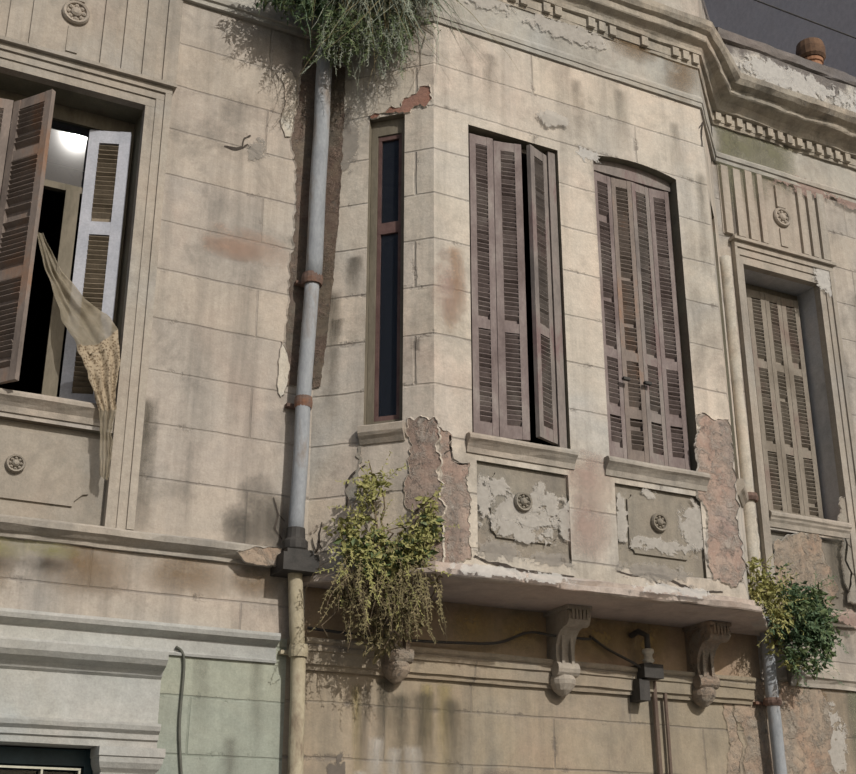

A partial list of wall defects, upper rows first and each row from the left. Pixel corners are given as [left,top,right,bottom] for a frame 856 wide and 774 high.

peeling [279,70,298,138]
flaking render [369,84,433,120]
peeling [736,55,856,112]
peeling [341,106,359,172]
peeling [403,415,574,568]
flaking render [616,412,747,589]
spalling [236,546,283,567]
flaking render [722,678,774,774]
flaking render [777,680,848,774]
flaking render [327,753,345,774]